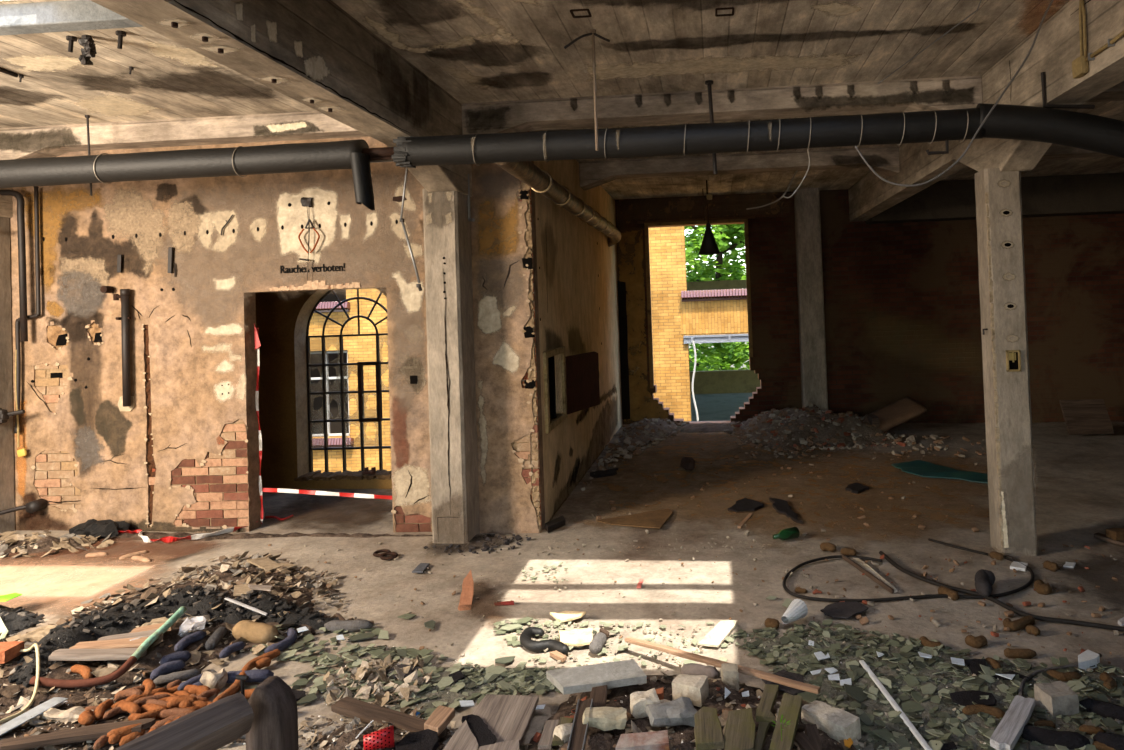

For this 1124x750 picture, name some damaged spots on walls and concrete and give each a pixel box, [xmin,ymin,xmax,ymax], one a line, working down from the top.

damp [365,0,519,123]
damp [79,95,158,116]
damp [57,272,106,317]
damp [70,388,132,470]
crack [405,274,467,542]
flaking render [31,450,81,513]
flaking render [169,419,249,529]
flaking render [391,506,432,532]